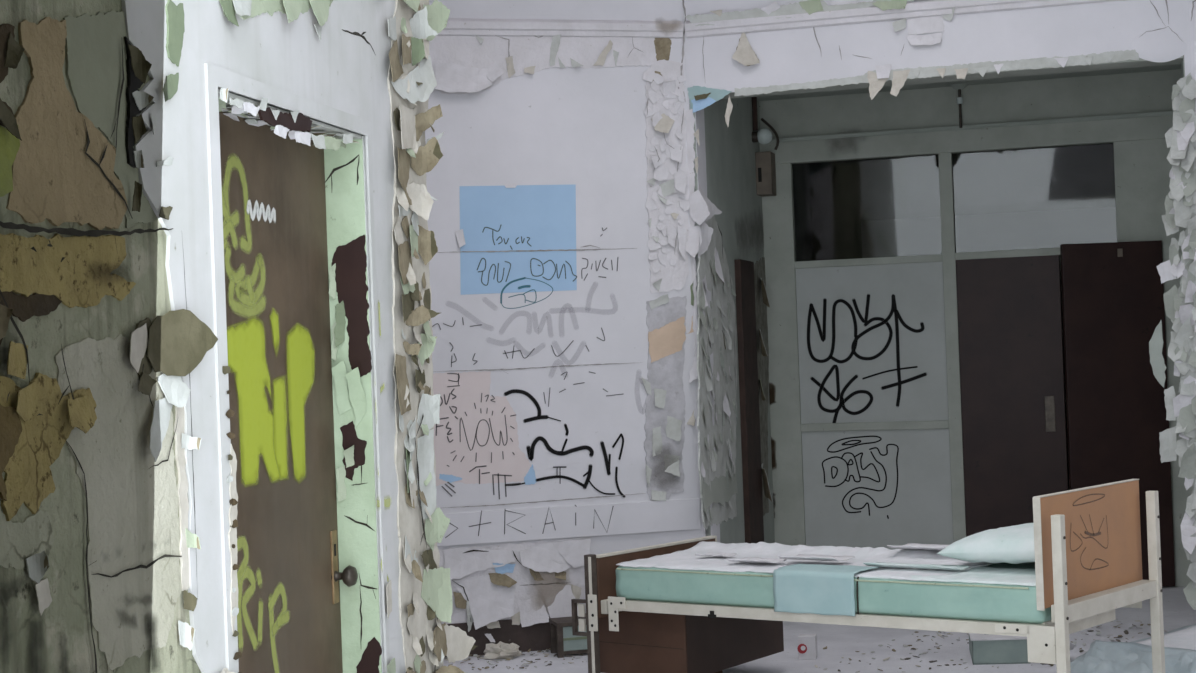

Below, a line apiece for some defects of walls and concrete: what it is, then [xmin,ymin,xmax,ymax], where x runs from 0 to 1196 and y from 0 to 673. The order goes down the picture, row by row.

flaking render [0,0,185,308]
peeling [219,0,333,40]
spalling [218,88,359,151]
flaking render [0,309,218,671]
crack [66,364,198,673]
peeling [226,409,239,637]
peeling [356,0,1139,673]
peeling [1149,72,1196,610]